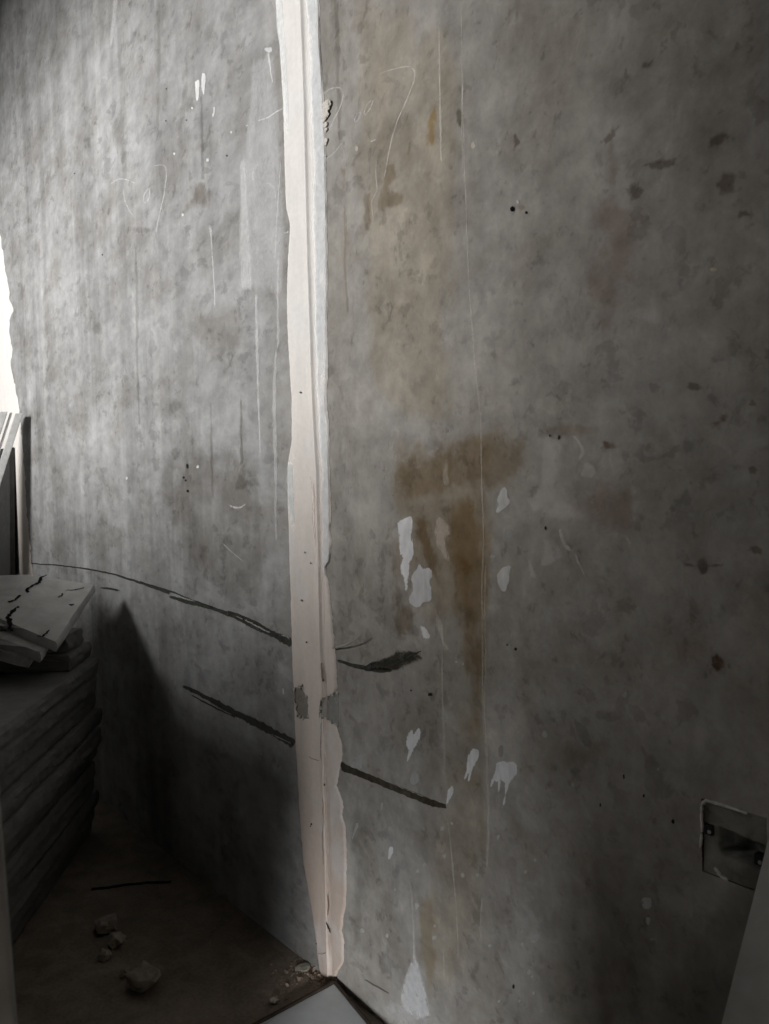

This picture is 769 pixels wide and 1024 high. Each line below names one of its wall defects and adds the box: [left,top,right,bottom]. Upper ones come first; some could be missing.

crack [0,563,292,647]
spalling [282,684,339,726]
crack [183,686,446,809]